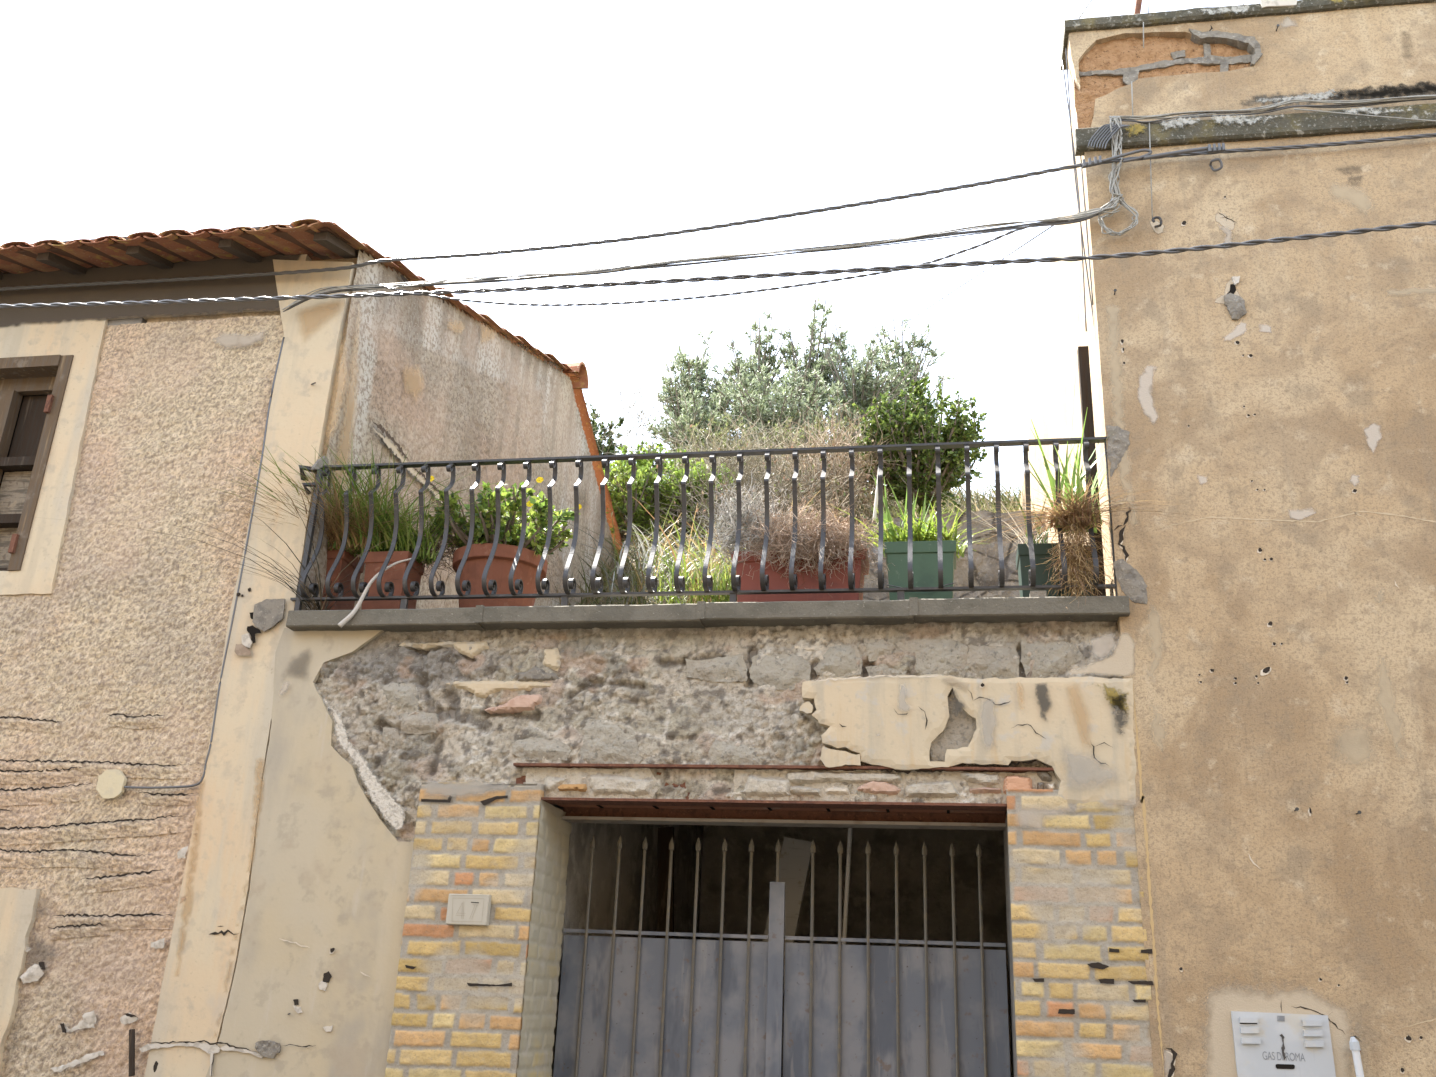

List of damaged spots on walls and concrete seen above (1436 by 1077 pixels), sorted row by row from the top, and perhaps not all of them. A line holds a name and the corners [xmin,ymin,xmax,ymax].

spalling [1074,28,1263,128]
spalling [1215,276,1247,321]
spalling [316,621,1137,842]